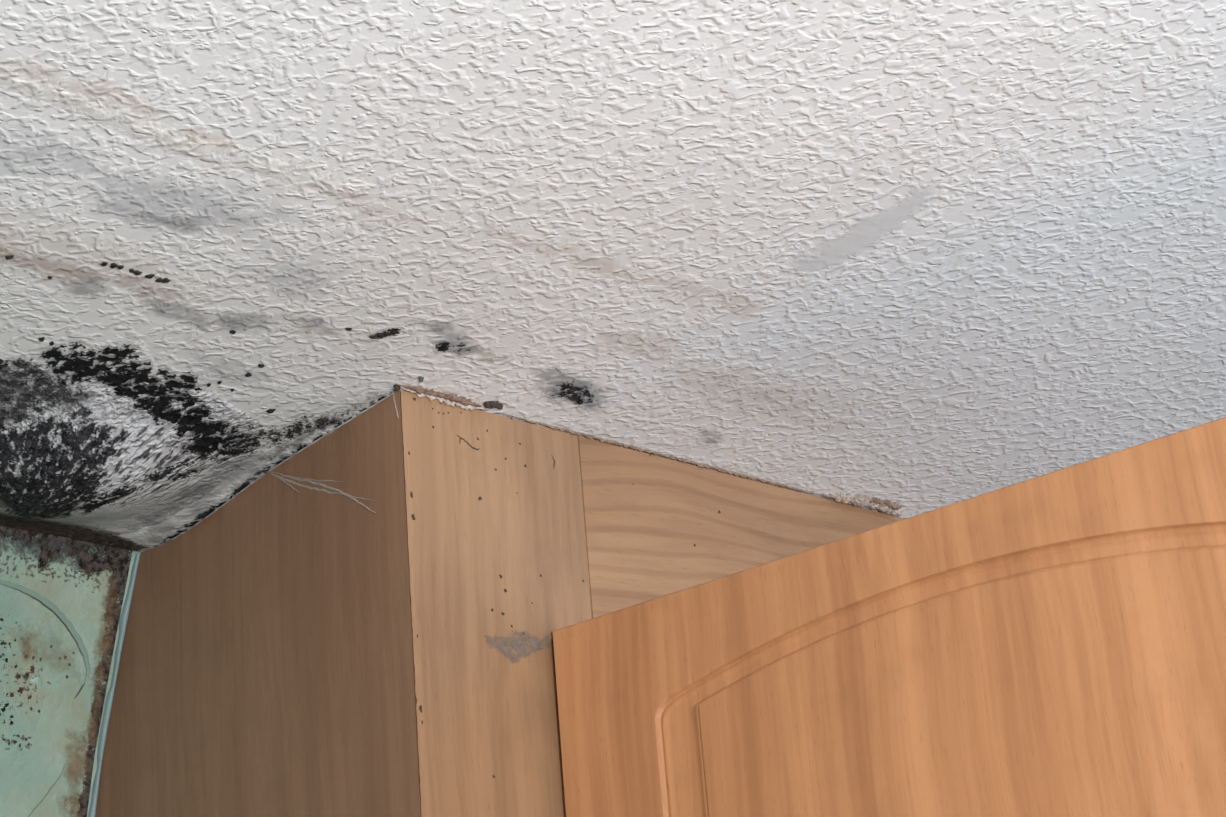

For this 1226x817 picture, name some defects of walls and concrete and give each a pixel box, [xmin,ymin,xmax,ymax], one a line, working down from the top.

leakage [101,262,171,283]
leakage [369,322,423,339]
leakage [545,381,598,409]
leakage [0,337,396,817]